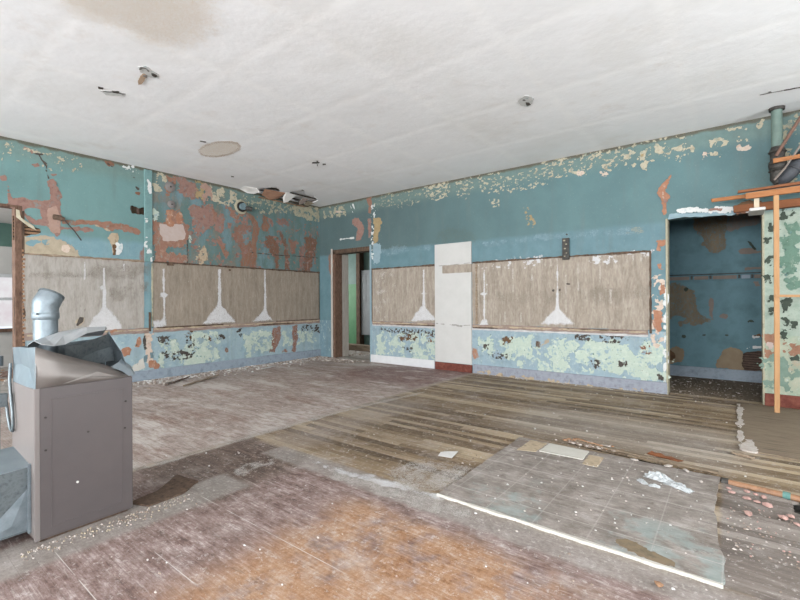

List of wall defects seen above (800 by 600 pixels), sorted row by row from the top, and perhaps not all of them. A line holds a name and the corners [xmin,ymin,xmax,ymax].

flaking render [138,66,159,85]
flaking render [0,142,320,371]
flaking render [352,119,765,360]
flaking render [472,239,728,392]
peeling [657,175,800,393]